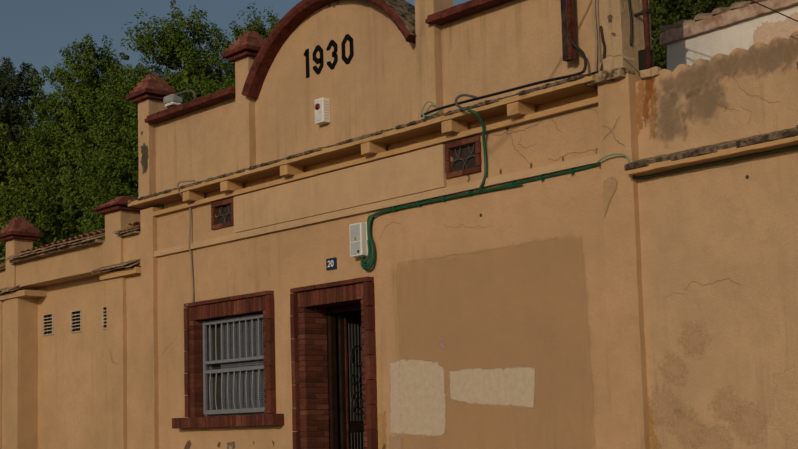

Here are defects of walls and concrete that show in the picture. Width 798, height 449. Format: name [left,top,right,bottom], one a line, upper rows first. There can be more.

peeling [753,12,798,45]
corrosion [636,76,656,138]
crack [486,116,625,165]